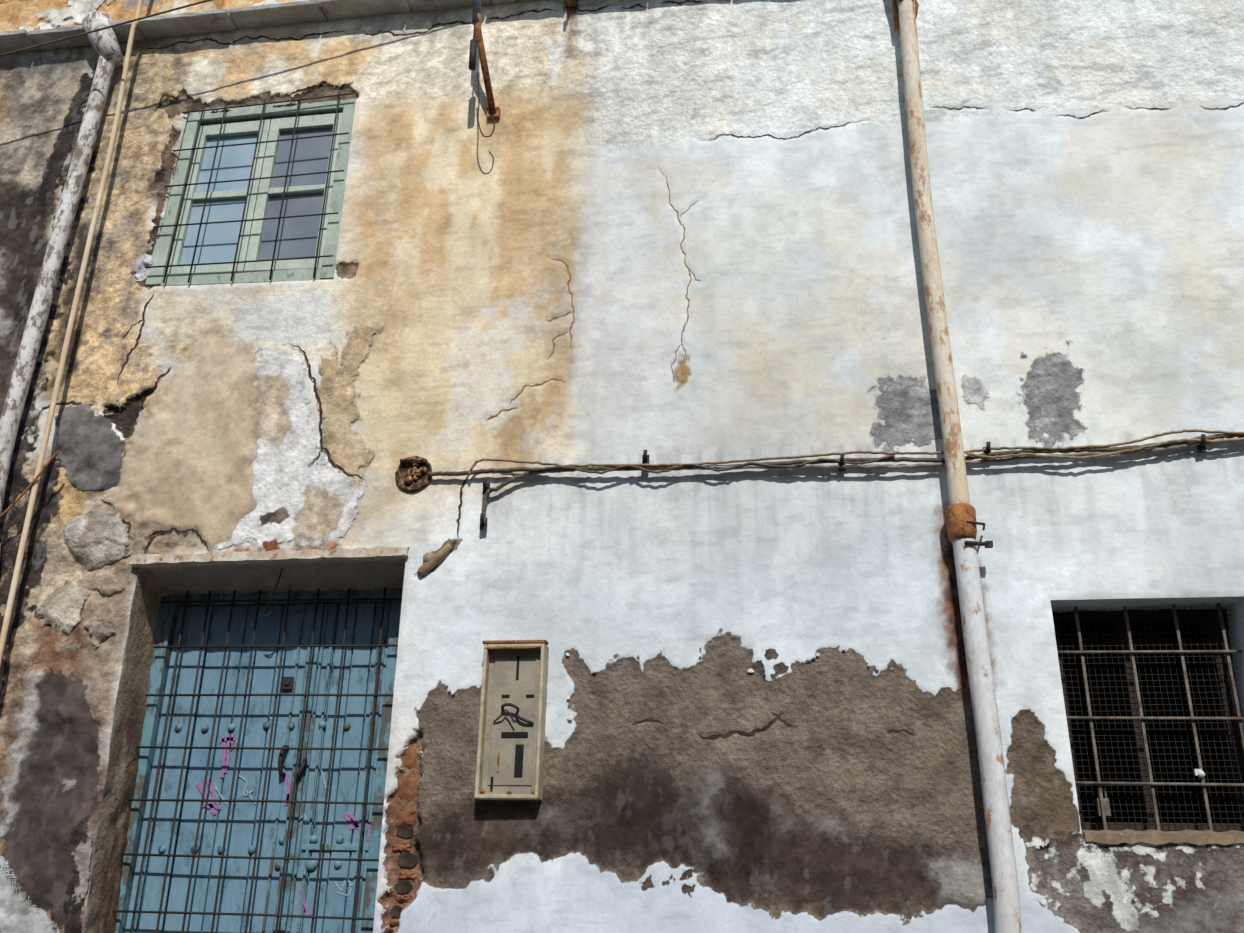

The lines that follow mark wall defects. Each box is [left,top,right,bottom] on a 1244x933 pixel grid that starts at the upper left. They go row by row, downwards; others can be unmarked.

crack [136,0,703,49]
leakage [0,62,98,417]
leakage [0,147,101,710]
crack [117,293,154,383]
peeling [215,346,364,549]
crack [285,344,369,485]
crack [658,166,700,388]
peeling [1017,340,1088,448]
corrosion [939,513,970,697]
leakage [1,667,102,933]
flaking render [387,628,993,933]
flaking render [1005,709,1244,933]